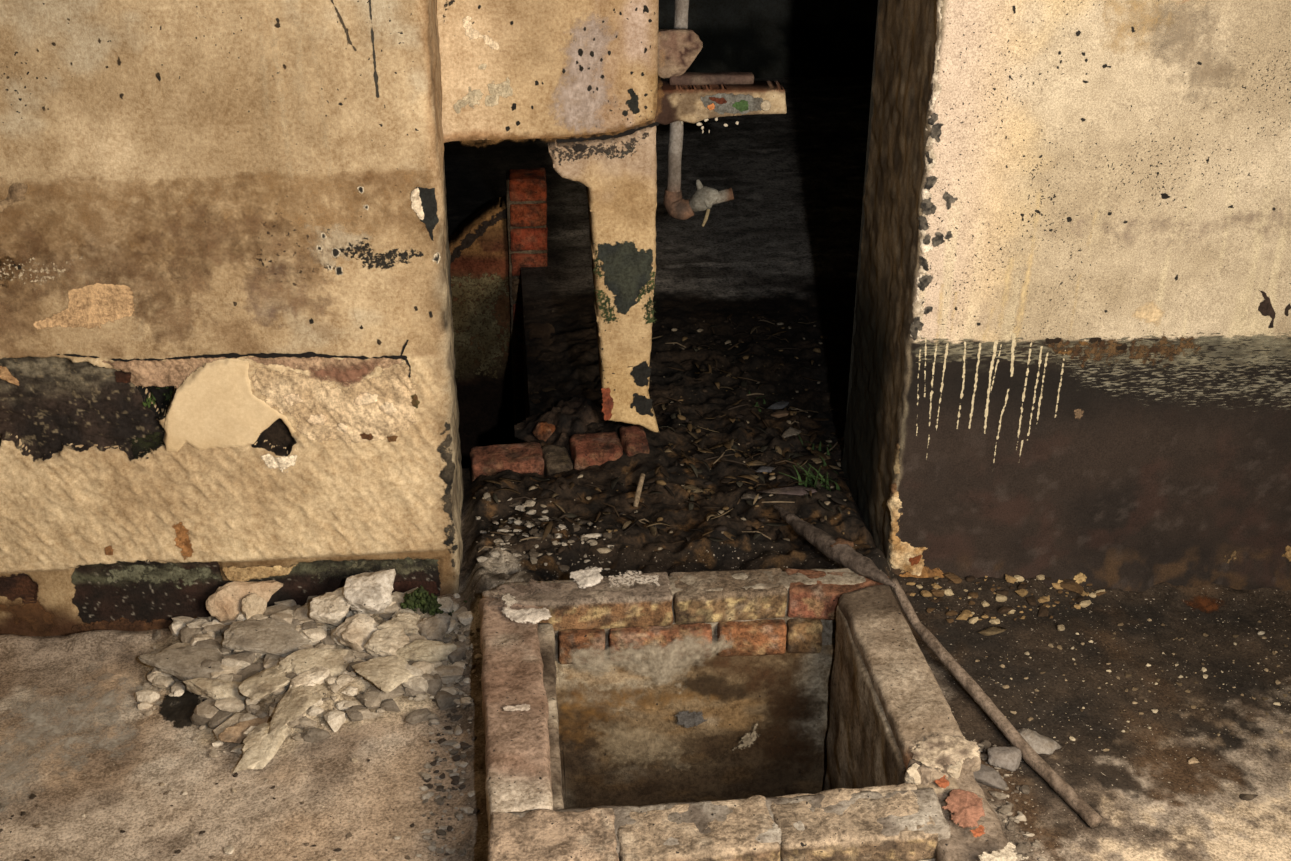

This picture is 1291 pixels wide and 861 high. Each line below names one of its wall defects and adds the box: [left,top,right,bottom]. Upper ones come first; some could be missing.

peeling [411,187,439,241]
peeling [910,0,958,342]
spalling [0,339,420,472]
crack [57,340,411,378]
water stain [916,255,1066,463]
peeling [222,564,296,582]
spalling [479,444,1009,861]